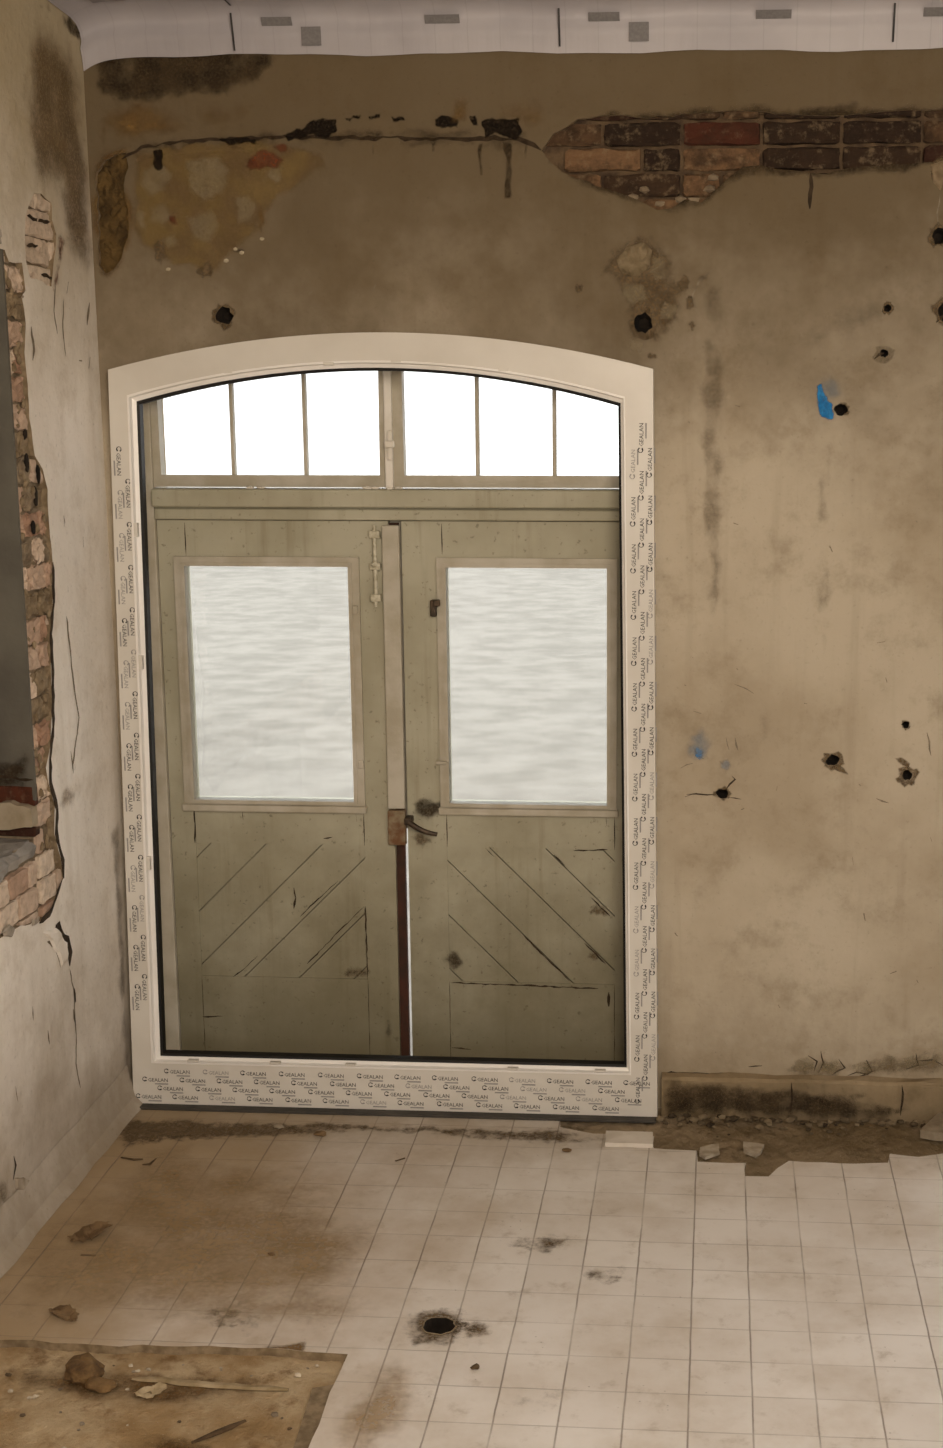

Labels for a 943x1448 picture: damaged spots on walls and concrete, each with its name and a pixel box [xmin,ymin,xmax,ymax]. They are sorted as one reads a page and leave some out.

water stain [65,19,80,38]
water stain [34,45,86,245]
spalling [94,150,131,273]
spalling [543,107,943,247]
spalling [631,312,654,340]
spalling [0,194,65,937]
water stain [667,1086,858,1118]